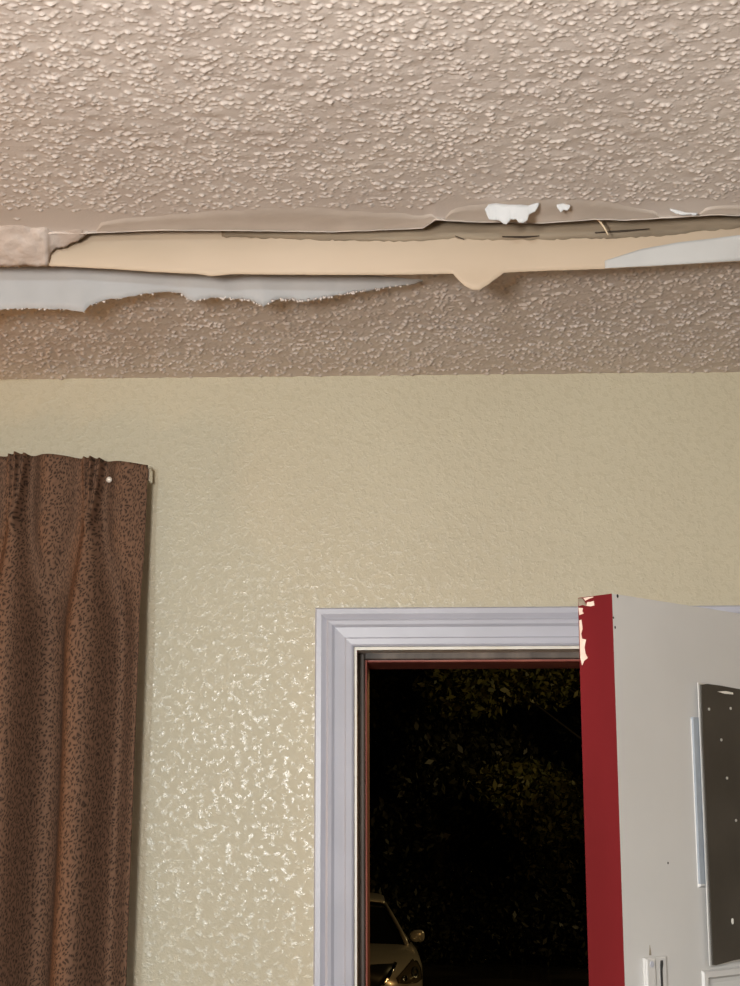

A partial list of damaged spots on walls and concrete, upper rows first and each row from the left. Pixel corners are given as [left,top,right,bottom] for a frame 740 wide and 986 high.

peeling [96,199,660,232]
crack [49,214,740,235]
peeling [670,205,740,216]